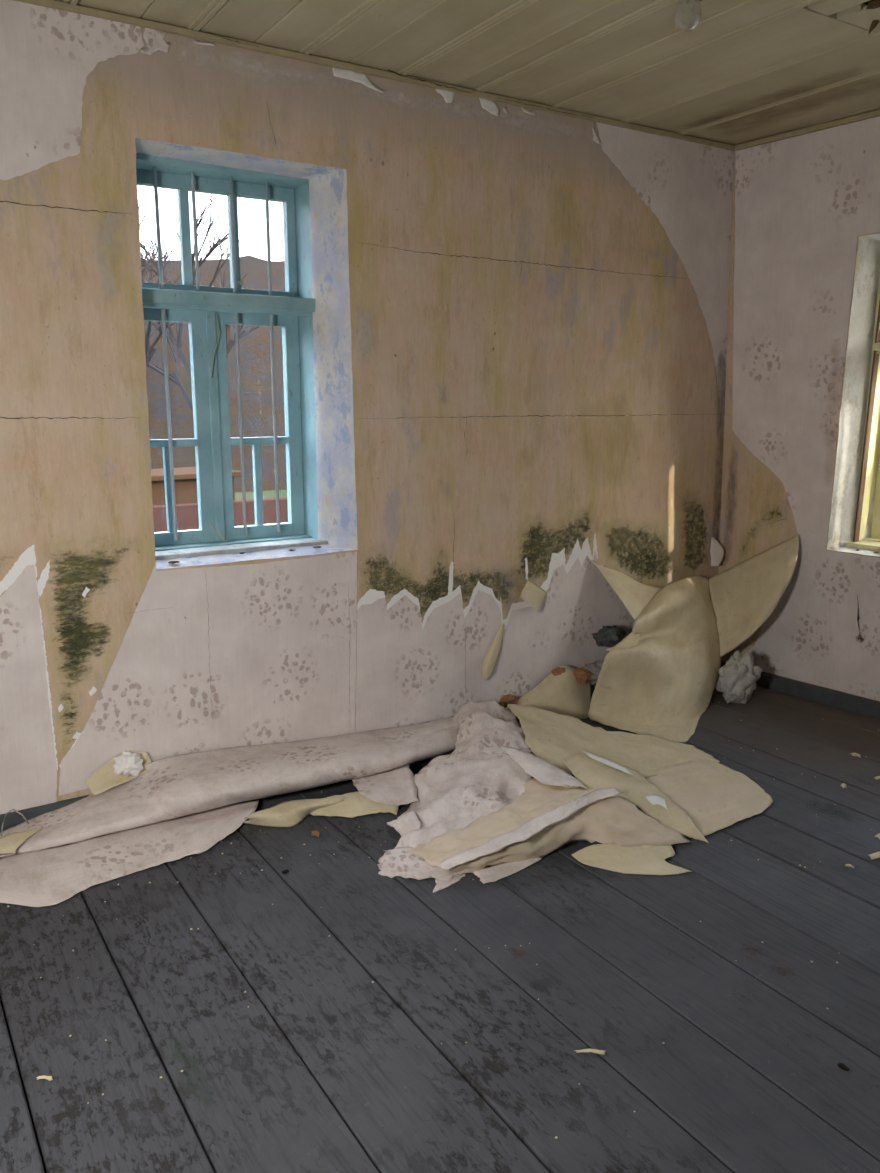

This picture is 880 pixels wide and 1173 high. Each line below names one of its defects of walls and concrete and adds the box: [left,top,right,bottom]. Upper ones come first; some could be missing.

peeling [332,67,384,93]
peeling [436,89,454,103]
peeling [479,98,536,116]
mould [366,518,590,613]
mould [607,503,706,580]
mould [54,549,128,680]